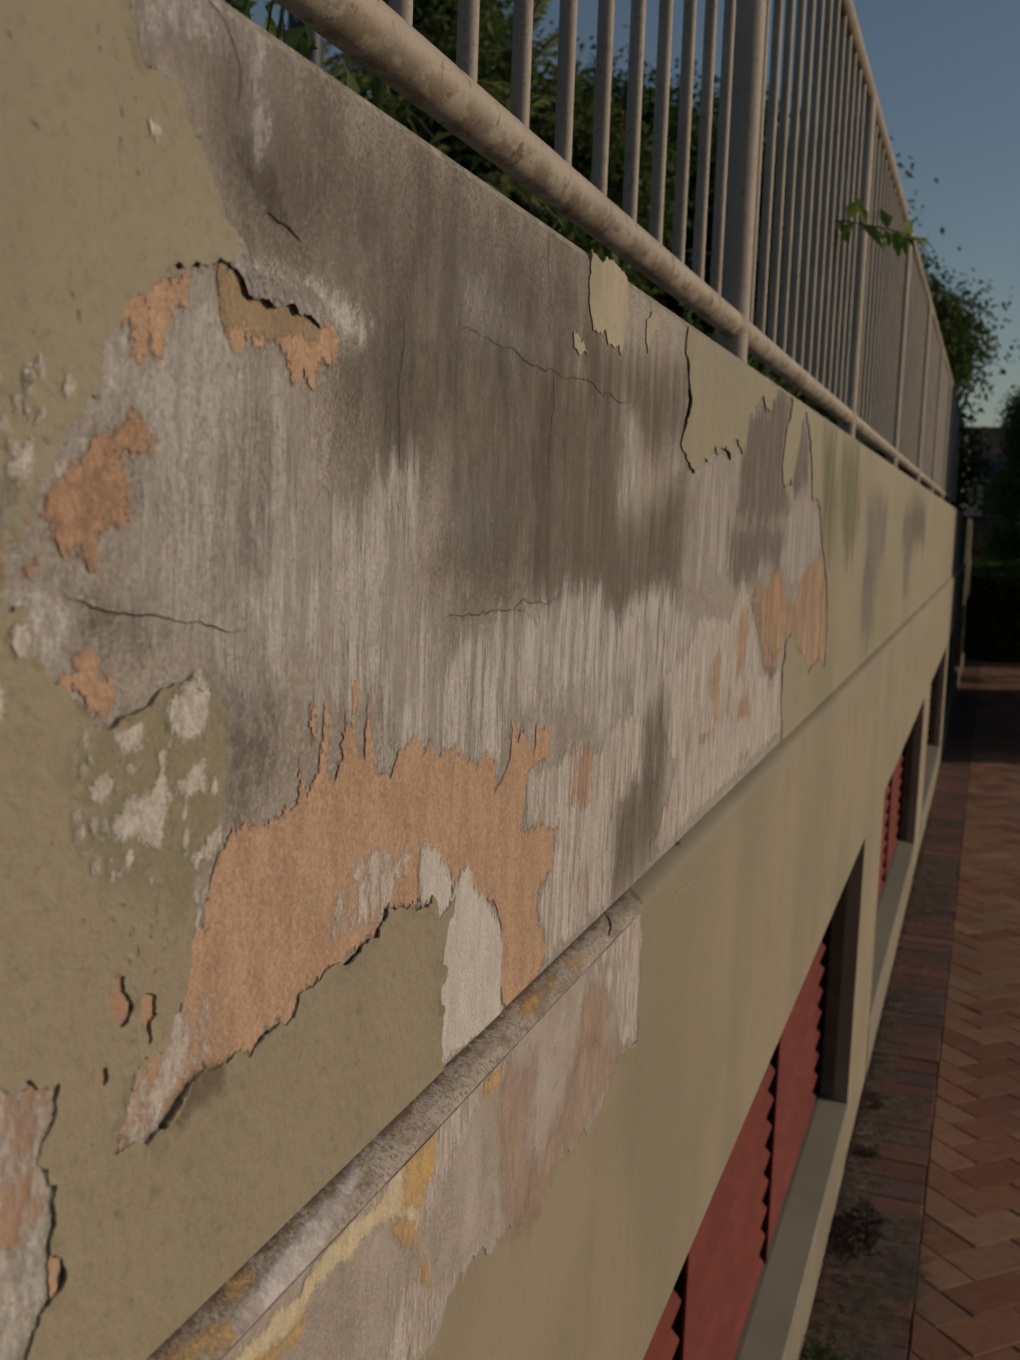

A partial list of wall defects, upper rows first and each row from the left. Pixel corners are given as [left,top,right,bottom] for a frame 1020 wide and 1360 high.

peeling [0,415,36,540]
crack [460,326,631,487]
peeling [112,720,146,759]
peeling [89,738,219,884]
crack [62,591,248,633]
peeling [711,651,722,718]
peeling [737,599,749,677]
peeling [109,977,154,1030]
peeling [572,960,610,1136]
peeling [502,1065,529,1221]
peeling [0,1082,60,1360]
peeling [236,1166,420,1360]